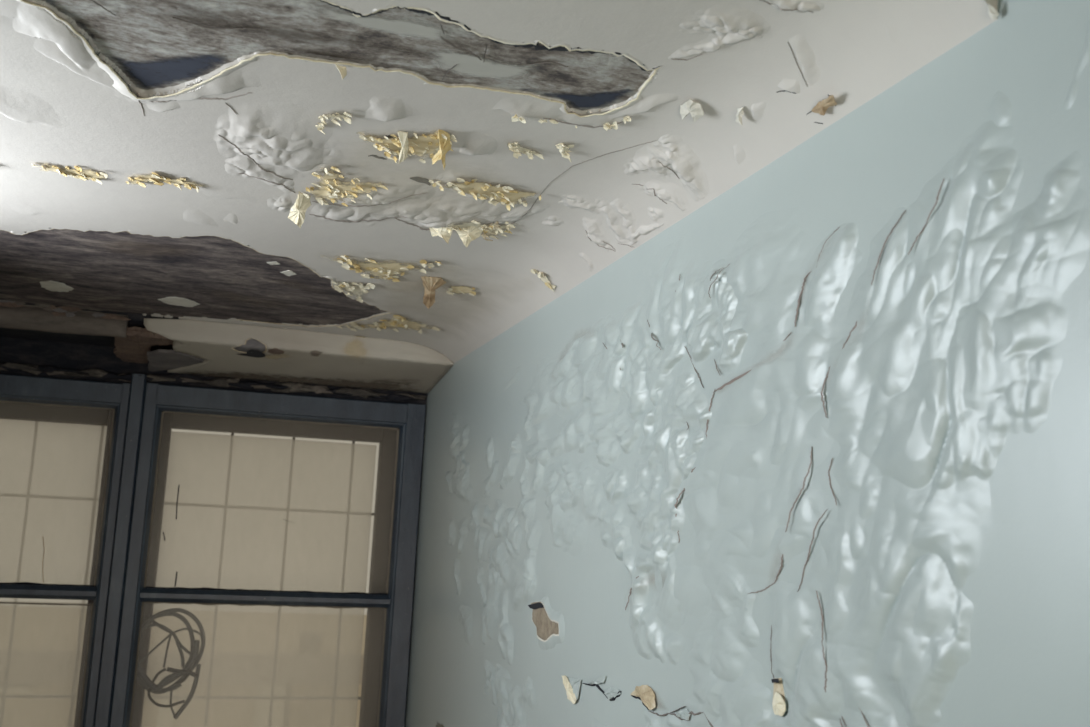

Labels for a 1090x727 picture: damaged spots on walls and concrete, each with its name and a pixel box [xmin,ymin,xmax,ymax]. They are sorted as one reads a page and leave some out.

flaking render [16,0,662,131]
peeling [315,112,352,135]
peeling [359,130,457,168]
peeling [555,143,574,162]
peeling [288,167,388,228]
peeling [429,178,541,248]
flaking render [0,228,476,402]
peeling [772,692,786,716]